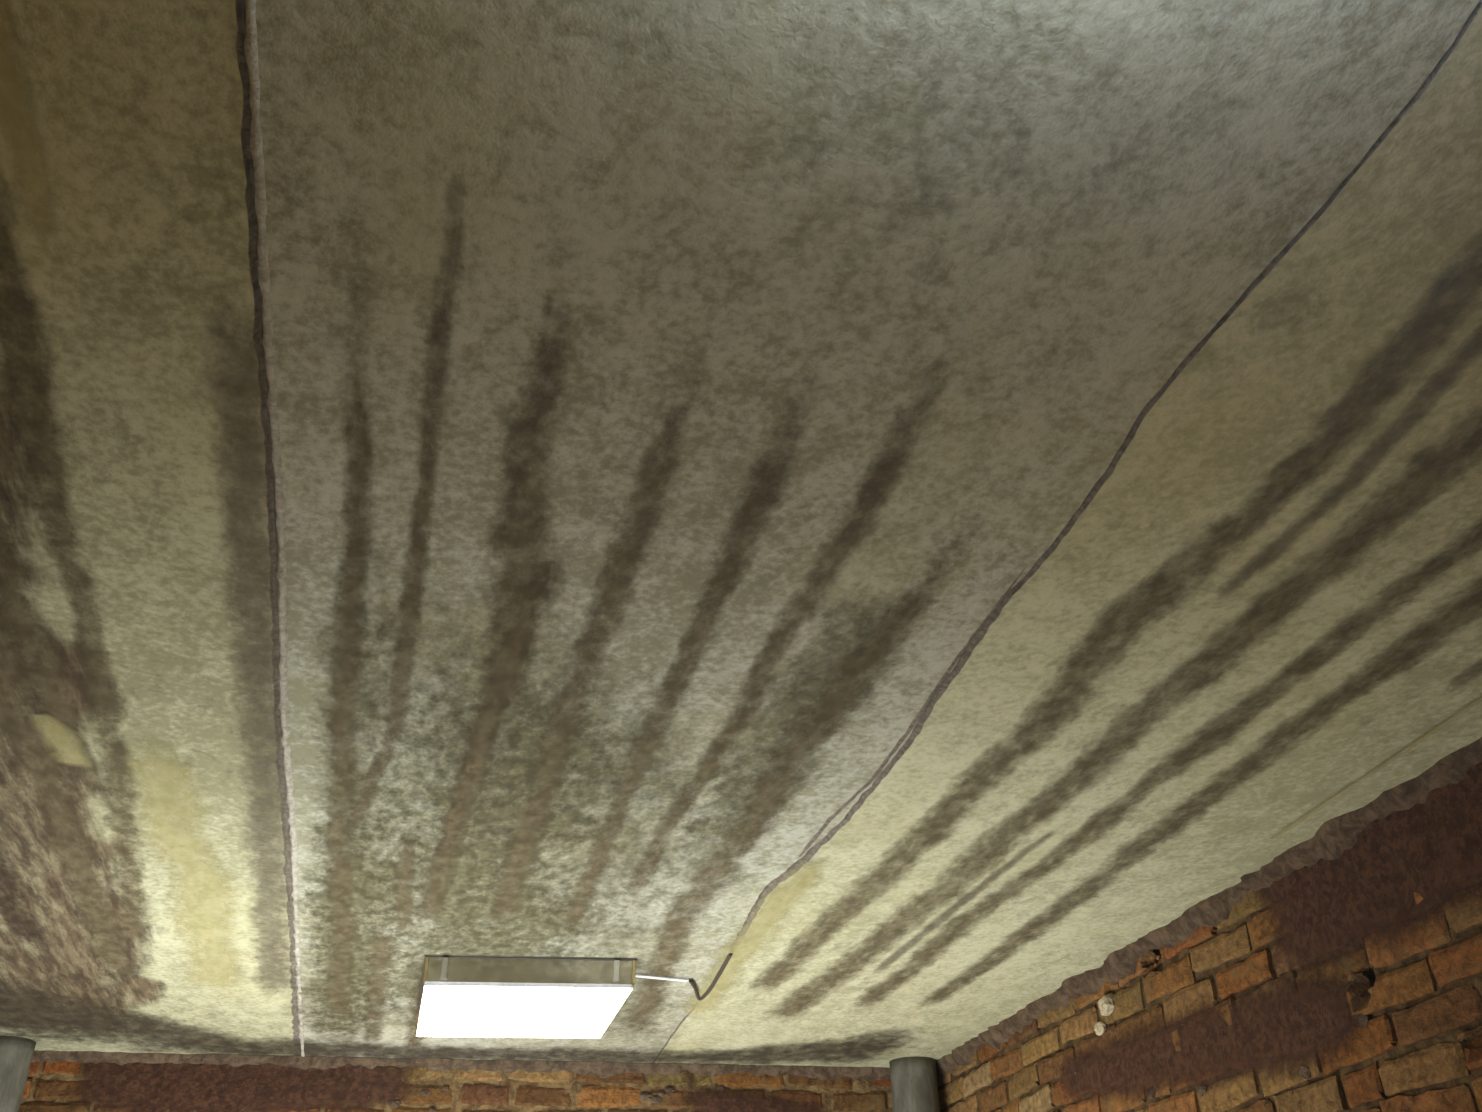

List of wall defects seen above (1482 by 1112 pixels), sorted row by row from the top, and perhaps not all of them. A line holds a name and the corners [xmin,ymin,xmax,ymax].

crack [235,0,306,1057]
leakage [0,216,941,1064]
crack [654,1004,697,1063]
crack [723,0,1482,962]
leakage [754,244,1482,1016]